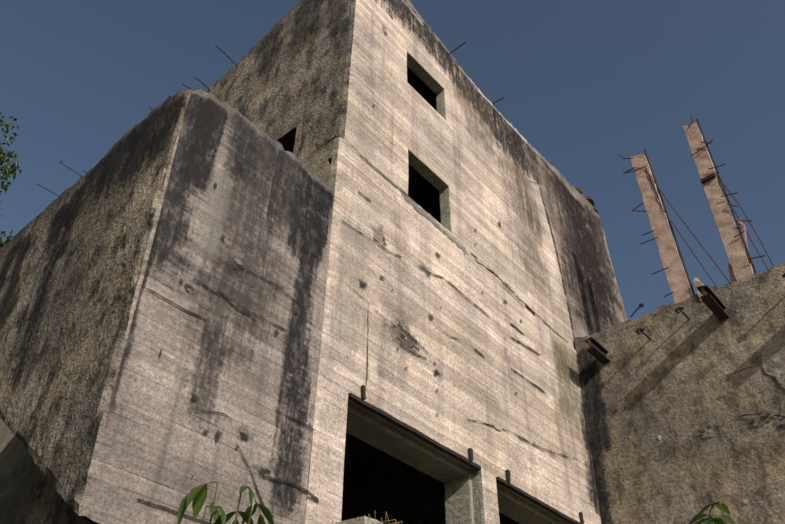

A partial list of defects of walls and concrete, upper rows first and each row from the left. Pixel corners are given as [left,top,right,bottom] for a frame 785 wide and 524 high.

damp [9,93,333,514]
damp [381,0,622,334]
damp [576,349,613,524]
crack [735,412,785,420]